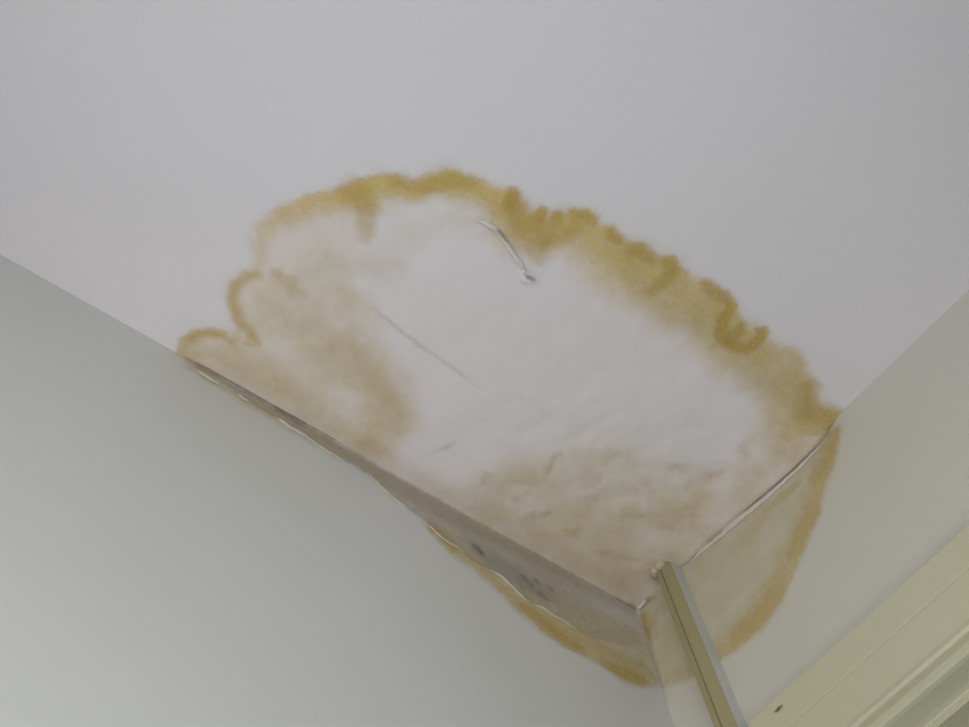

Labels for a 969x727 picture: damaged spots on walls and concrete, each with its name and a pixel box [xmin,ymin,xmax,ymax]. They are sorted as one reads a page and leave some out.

leakage [279,171,683,289]
leakage [510,591,645,681]